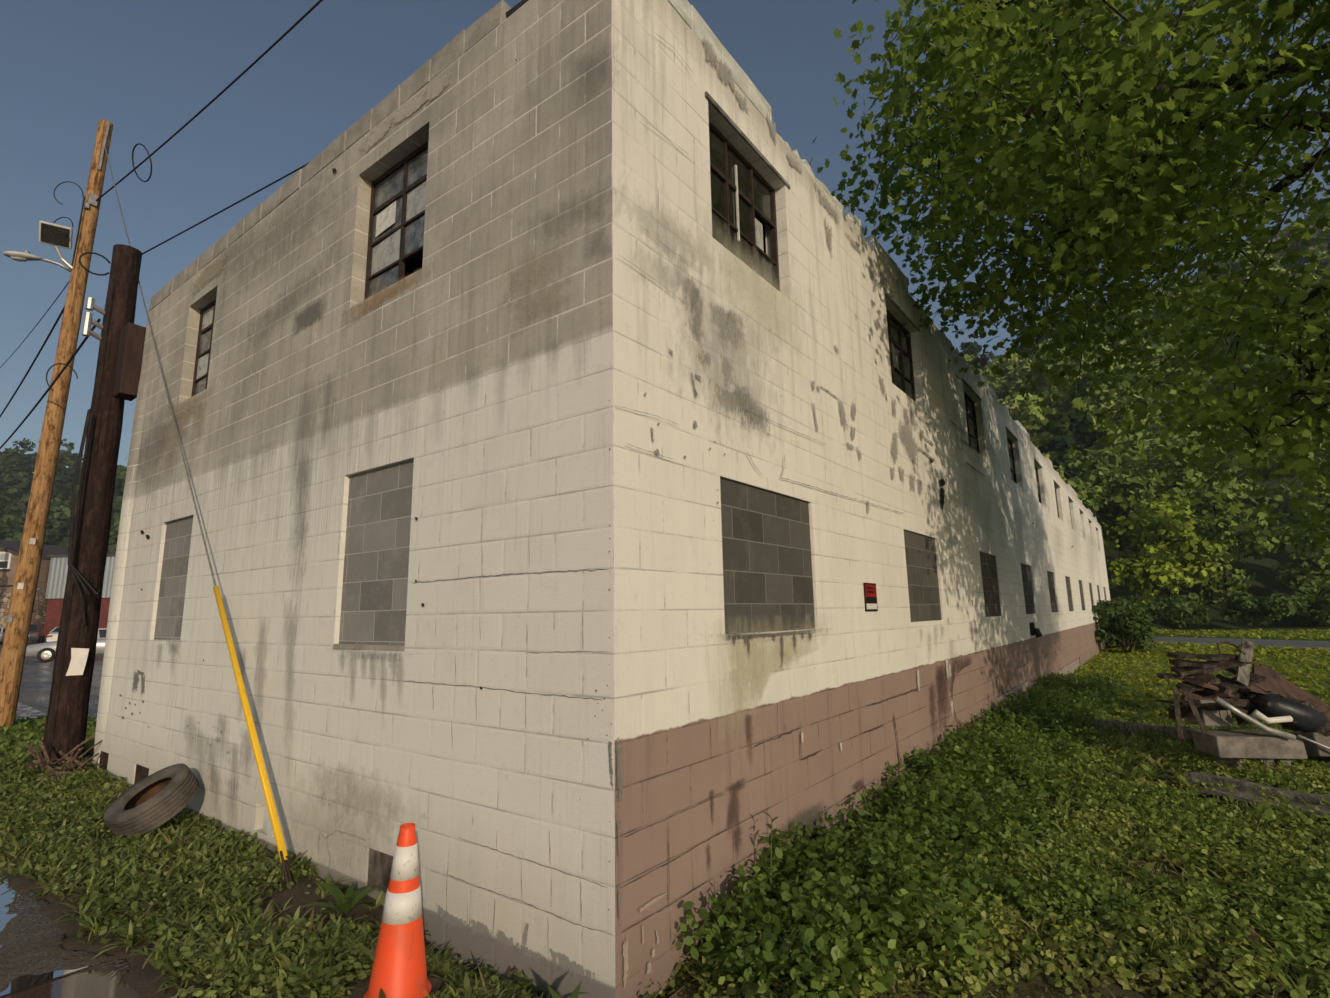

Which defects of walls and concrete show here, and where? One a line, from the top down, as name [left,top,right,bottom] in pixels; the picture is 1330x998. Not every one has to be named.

leakage [297,301,321,331]
leakage [685,280,742,345]
leakage [704,354,766,425]
peeling [812,381,861,461]
peeling [878,373,922,495]
leakage [728,630,813,662]
leakage [931,657,969,726]
leakage [711,782,744,850]